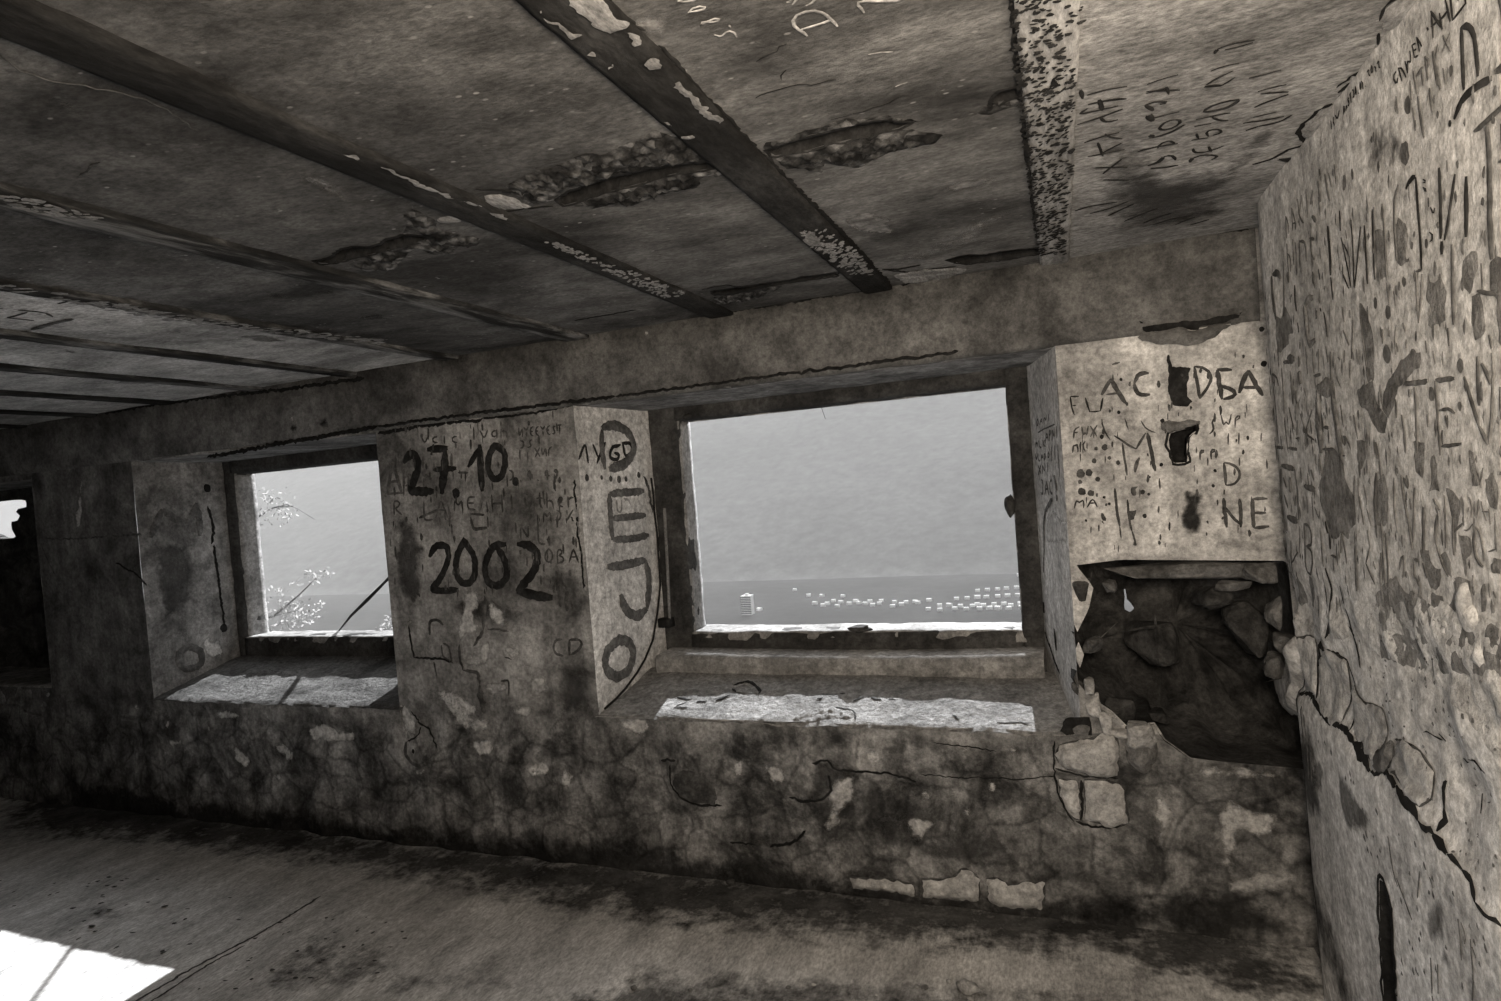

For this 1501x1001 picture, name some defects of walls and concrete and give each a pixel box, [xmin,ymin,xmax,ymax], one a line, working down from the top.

peeling [540,0,662,70]
peeling [674,82,724,124]
spalling [978,86,1022,115]
spalling [763,115,942,173]
flaking render [1400,141,1409,166]
peeling [0,195,103,221]
spalling [311,122,722,271]
peeling [544,242,685,299]
spalling [710,212,1039,305]
spalling [1060,434,1501,1001]
crack [1299,625,1501,927]